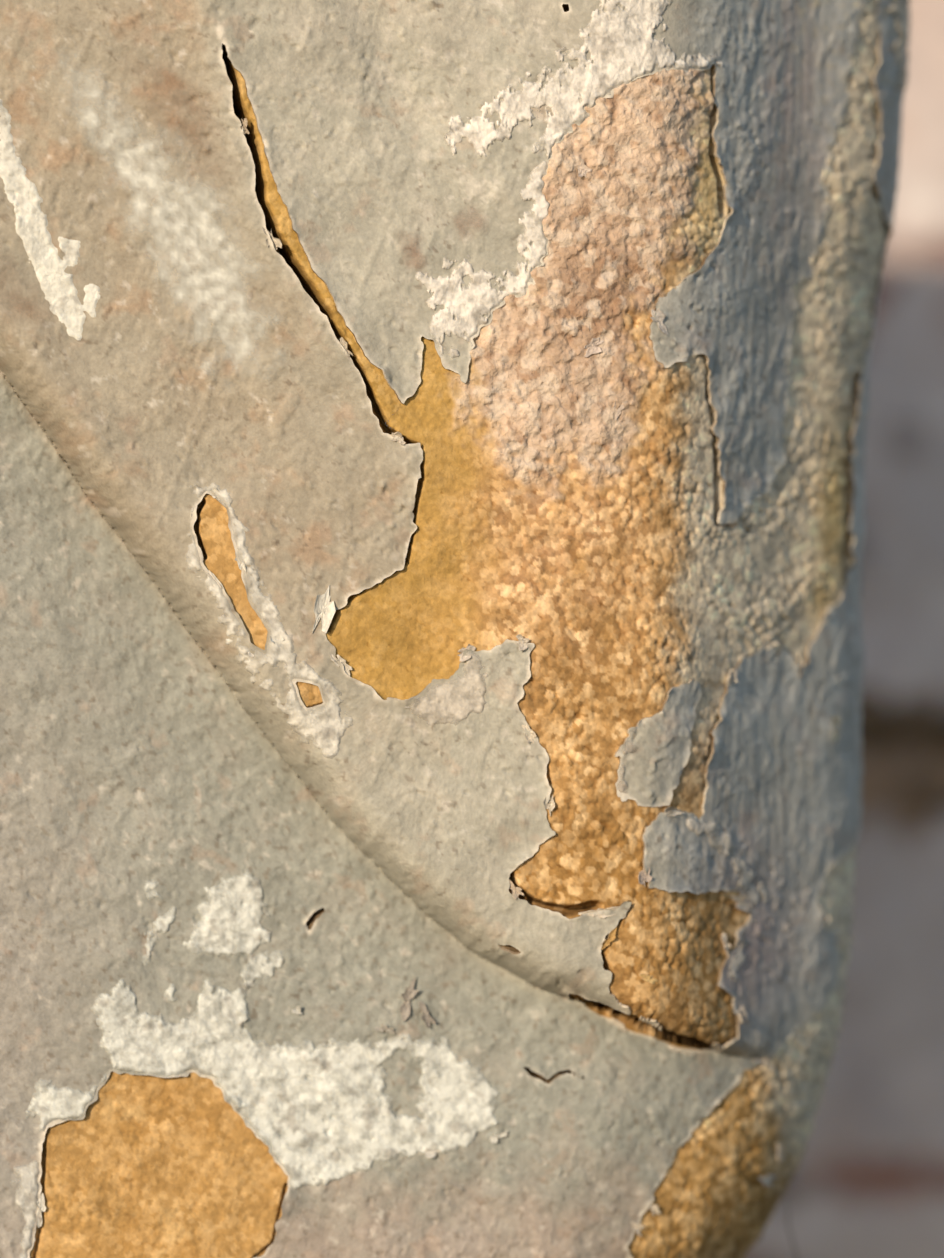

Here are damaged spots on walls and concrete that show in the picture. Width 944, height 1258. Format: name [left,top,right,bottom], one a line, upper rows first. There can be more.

crack [222,44,406,445]
peeling [187,483,353,757]
peeling [312,0,910,1050]
spalling [861,687,944,832]
peeling [14,873,508,1258]
peeling [627,841,944,1258]